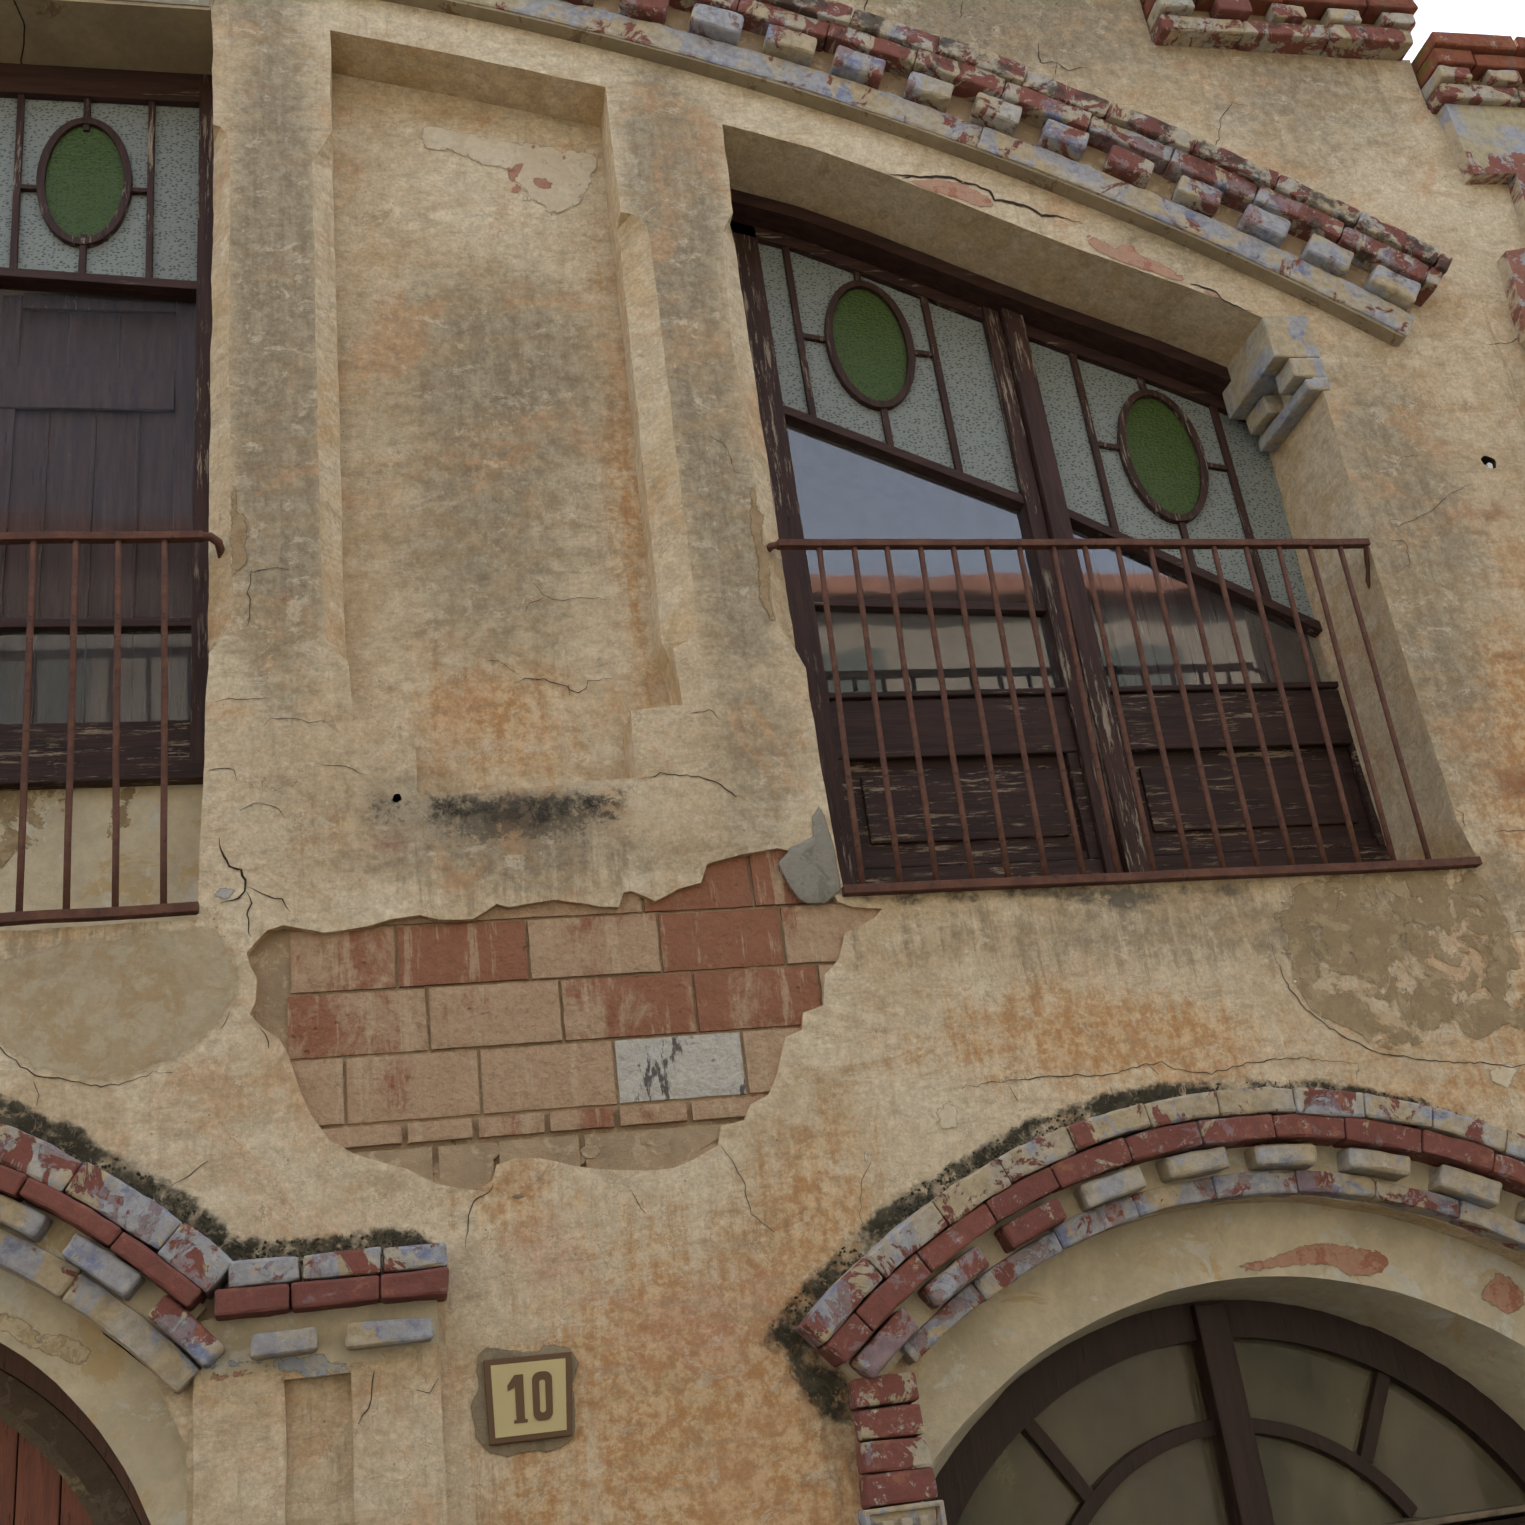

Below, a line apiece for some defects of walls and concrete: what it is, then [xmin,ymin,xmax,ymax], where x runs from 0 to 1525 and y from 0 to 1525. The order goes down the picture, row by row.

crack [890,174,1080,222]
water stain [431,791,621,822]
crack [208,768,289,936]
peeling [1274,869,1525,1053]
spalling [248,850,881,1190]
crack [962,934,1525,1103]
crack [0,1047,173,1106]
peeling [1239,1244,1388,1276]
peeling [1482,1273,1524,1314]